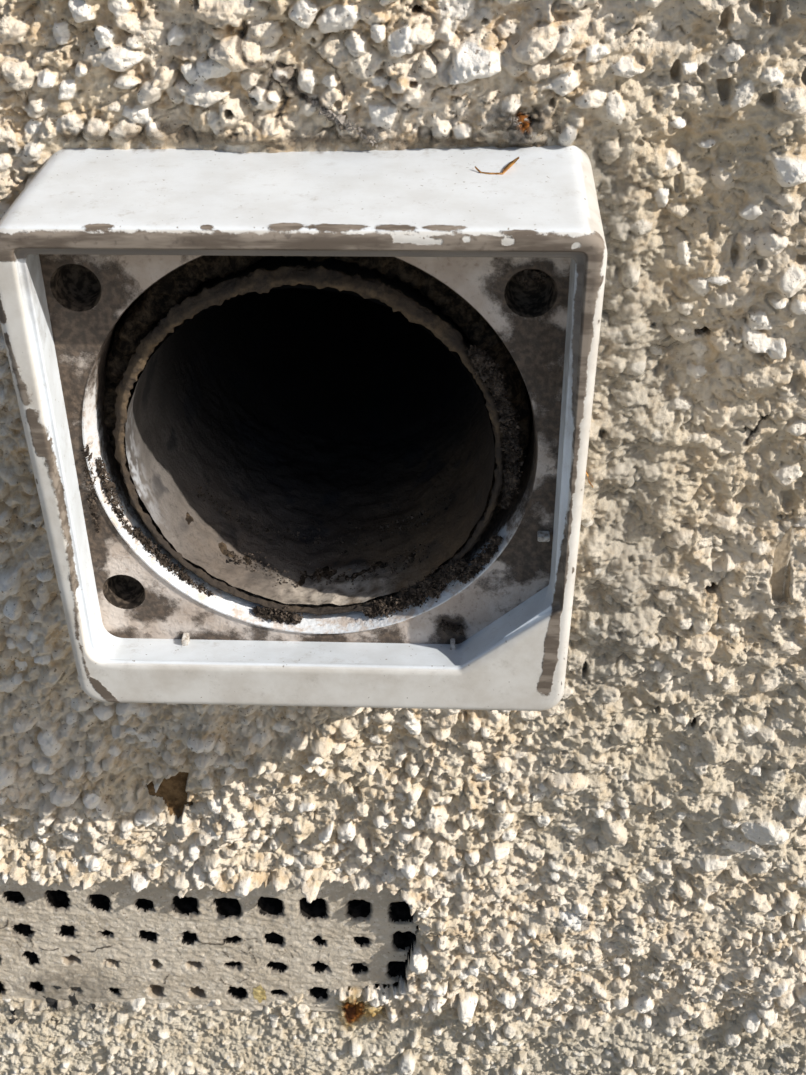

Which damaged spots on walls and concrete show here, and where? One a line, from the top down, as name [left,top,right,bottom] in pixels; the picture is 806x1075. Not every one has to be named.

spalling [146,772,193,819]
rust [341,996,383,1027]